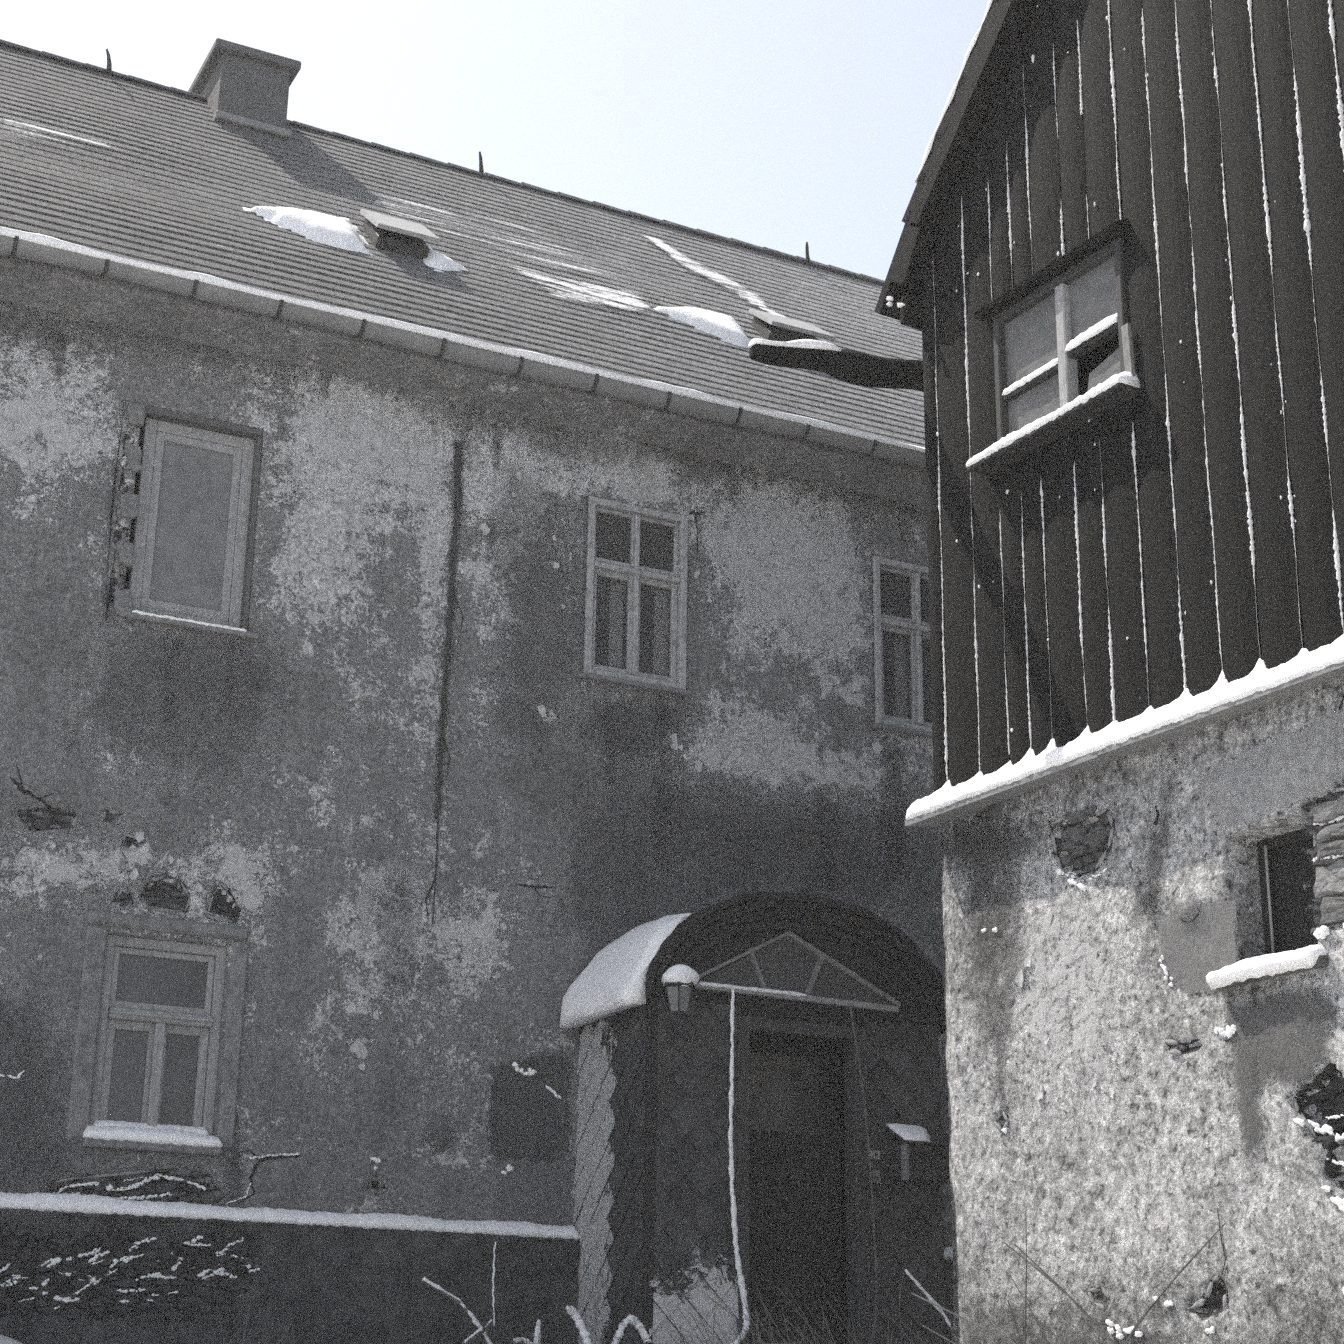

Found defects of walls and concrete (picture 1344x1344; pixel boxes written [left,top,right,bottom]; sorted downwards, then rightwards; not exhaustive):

crack [425,441,464,925]
peeling [17,808,264,923]
spalling [1300,776,1344,932]
peeling [1000,805,1123,1100]
water stain [1226,992,1336,1152]
spalling [1293,1058,1344,1190]